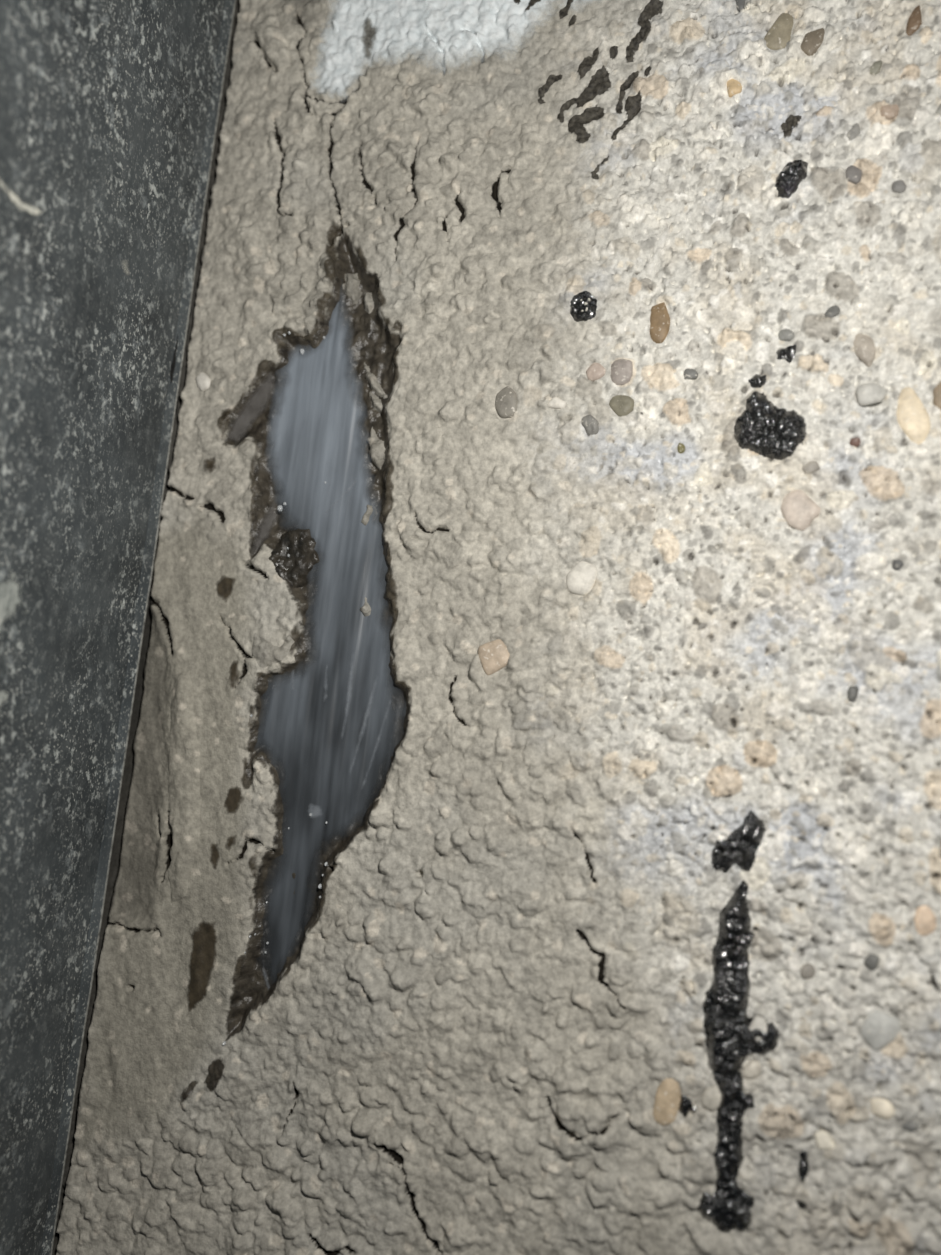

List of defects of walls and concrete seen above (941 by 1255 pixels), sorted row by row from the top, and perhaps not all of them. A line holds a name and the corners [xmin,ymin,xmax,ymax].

crack [254,16,373,236]
crack [394,156,418,253]
crack [442,170,511,232]
spalling [218,224,410,1039]
crack [576,929,625,1008]
crack [548,1097,616,1141]
crack [309,1234,354,1255]
crack [374,1144,443,1253]